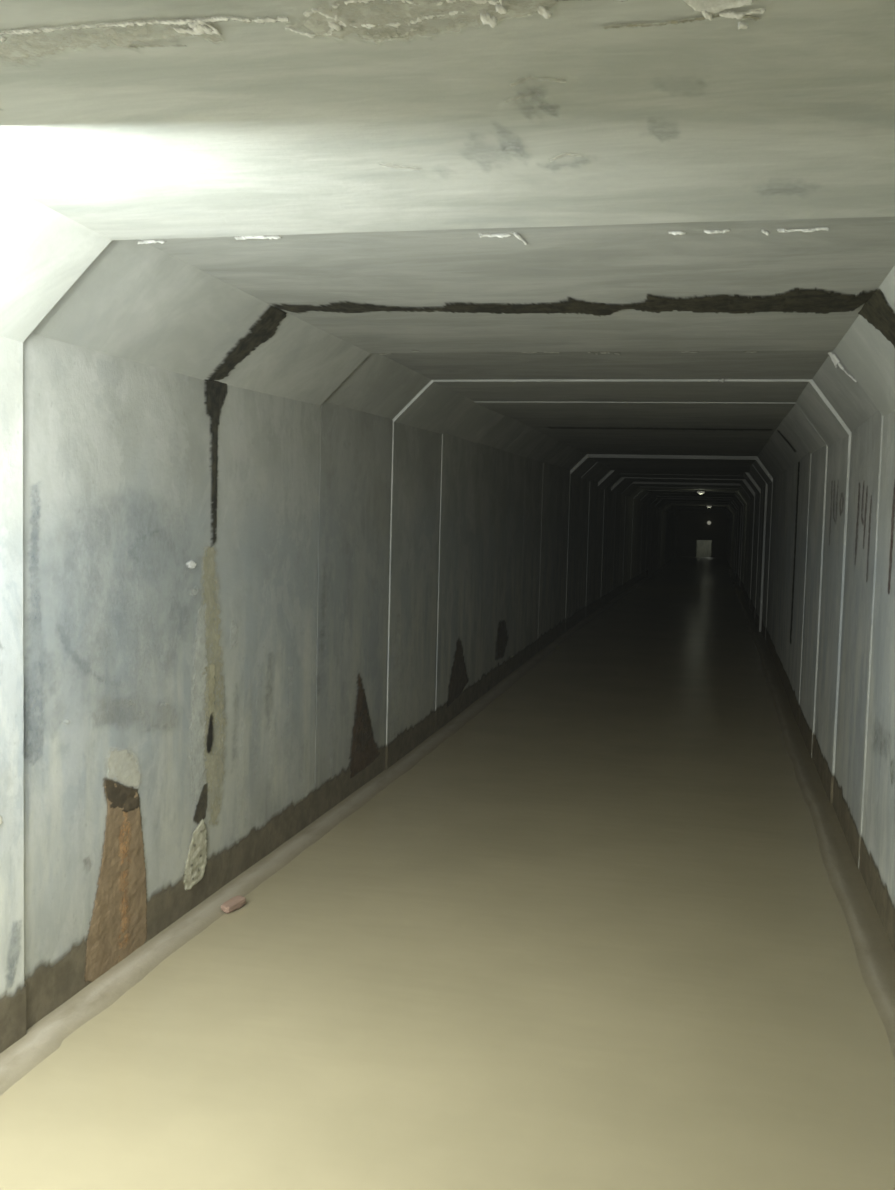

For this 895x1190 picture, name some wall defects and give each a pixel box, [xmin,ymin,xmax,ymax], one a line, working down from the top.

crack [205,288,895,545]
crack [585,428,800,643]
water stain [23,689,43,752]
rust [84,751,147,983]
flaking render [184,819,208,891]
water stain [132,548,648,947]
water stain [736,574,895,953]
water stain [0,938,94,1053]